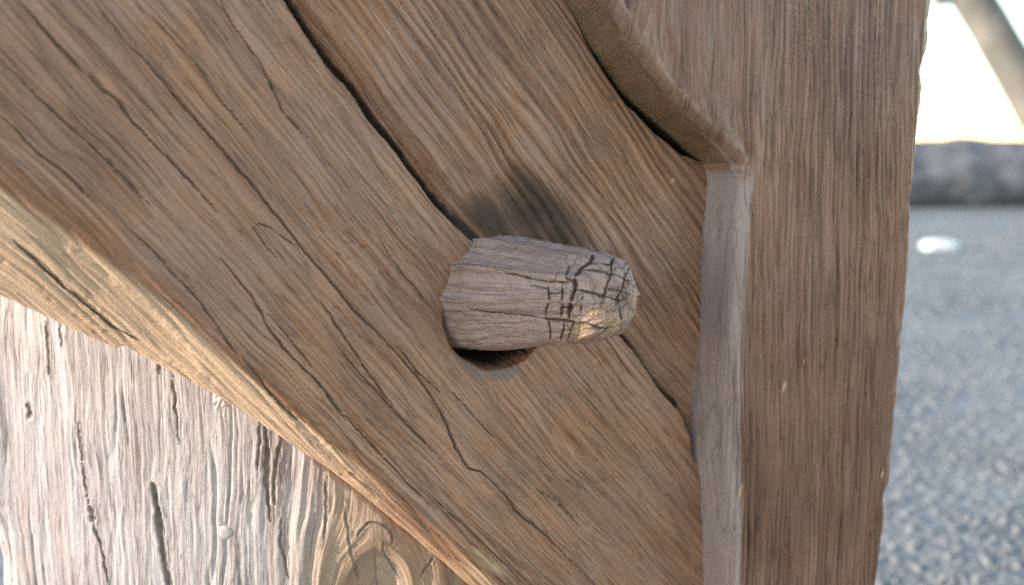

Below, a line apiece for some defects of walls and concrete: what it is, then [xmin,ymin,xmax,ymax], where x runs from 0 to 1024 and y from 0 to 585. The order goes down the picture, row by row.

crack [94,0,592,585]
crack [469,255,632,340]